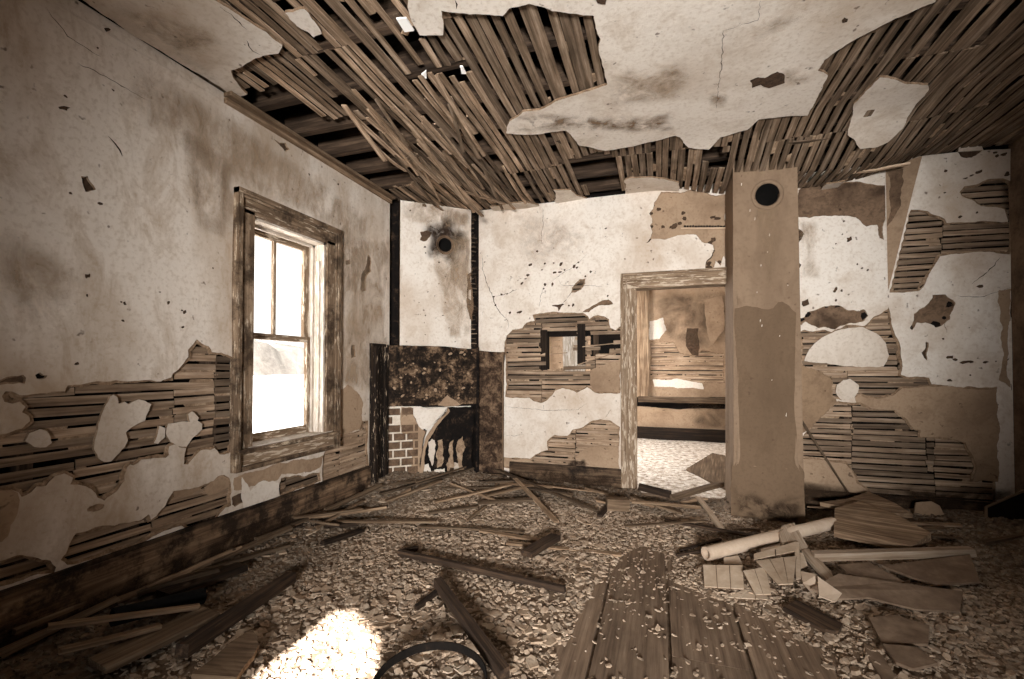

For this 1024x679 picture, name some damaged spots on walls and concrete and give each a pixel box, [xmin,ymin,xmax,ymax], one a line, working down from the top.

flaking render [956,147,1007,158]
flaking render [798,169,1010,293]
flaking render [504,250,621,403]
flaking render [0,340,231,542]
flaking render [0,385,368,586]
flaking render [504,419,620,469]
peeling [649,287,1011,524]